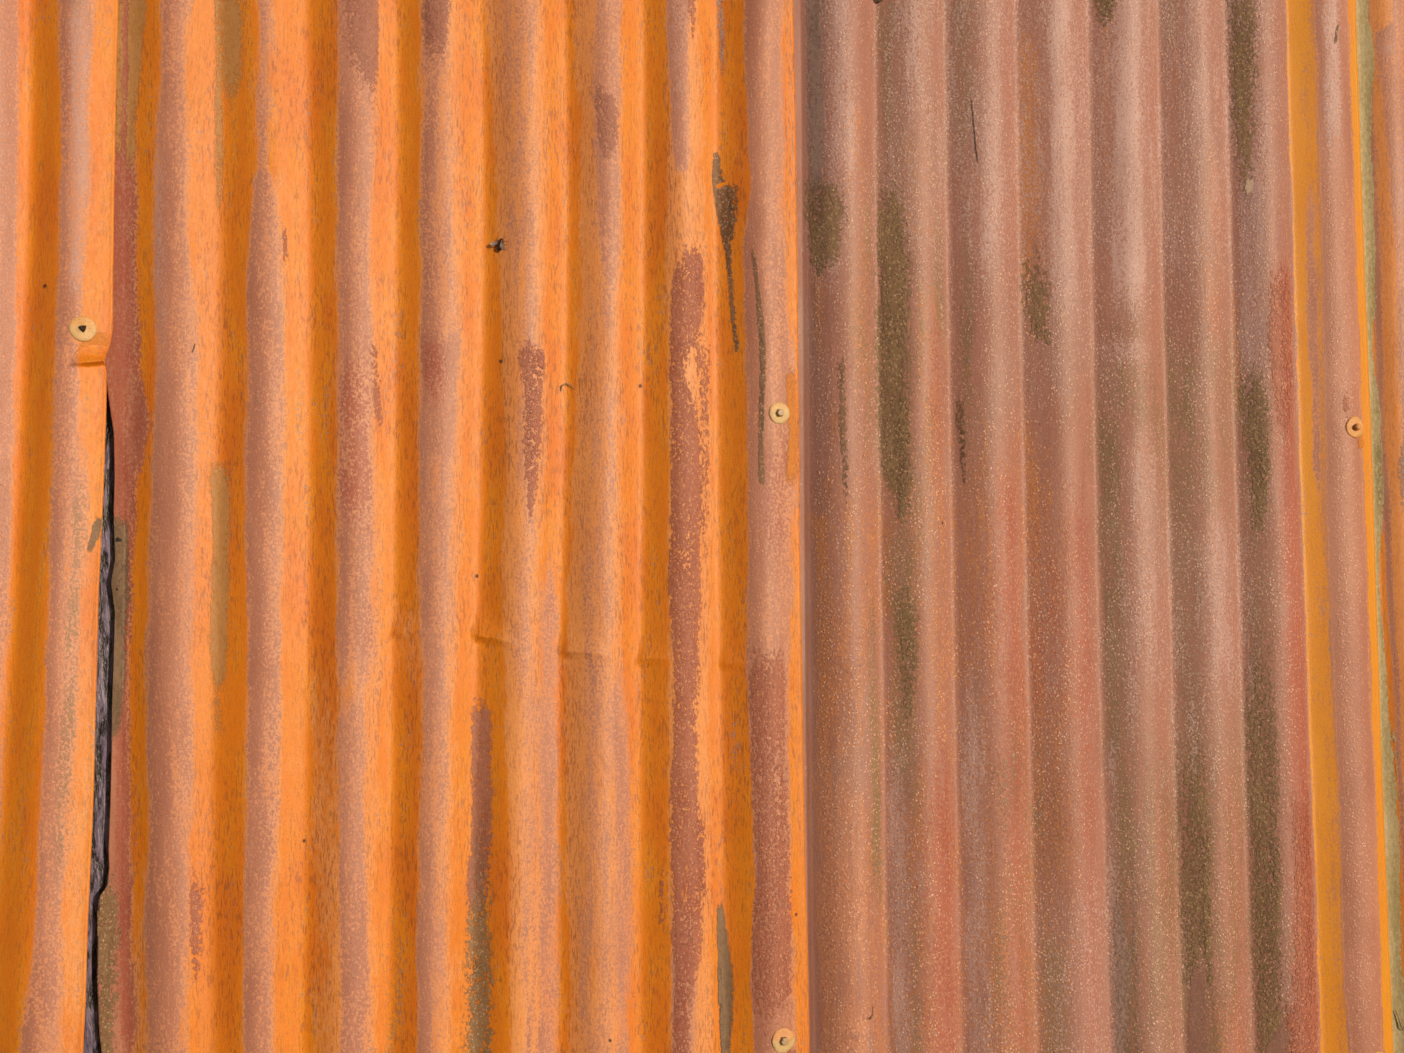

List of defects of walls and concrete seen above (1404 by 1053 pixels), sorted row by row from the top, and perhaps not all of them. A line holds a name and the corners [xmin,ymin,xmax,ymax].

rust [215,0,243,207]
rust [346,0,380,93]
rust [421,0,451,59]
rust [371,344,383,426]
rust [499,340,545,522]
rust [786,373,798,484]
rust [1267,259,1294,434]
rust [659,244,711,1053]
rust [188,882,205,980]
rust [465,697,494,912]
rust [749,648,797,1031]
rust [1286,784,1319,1053]